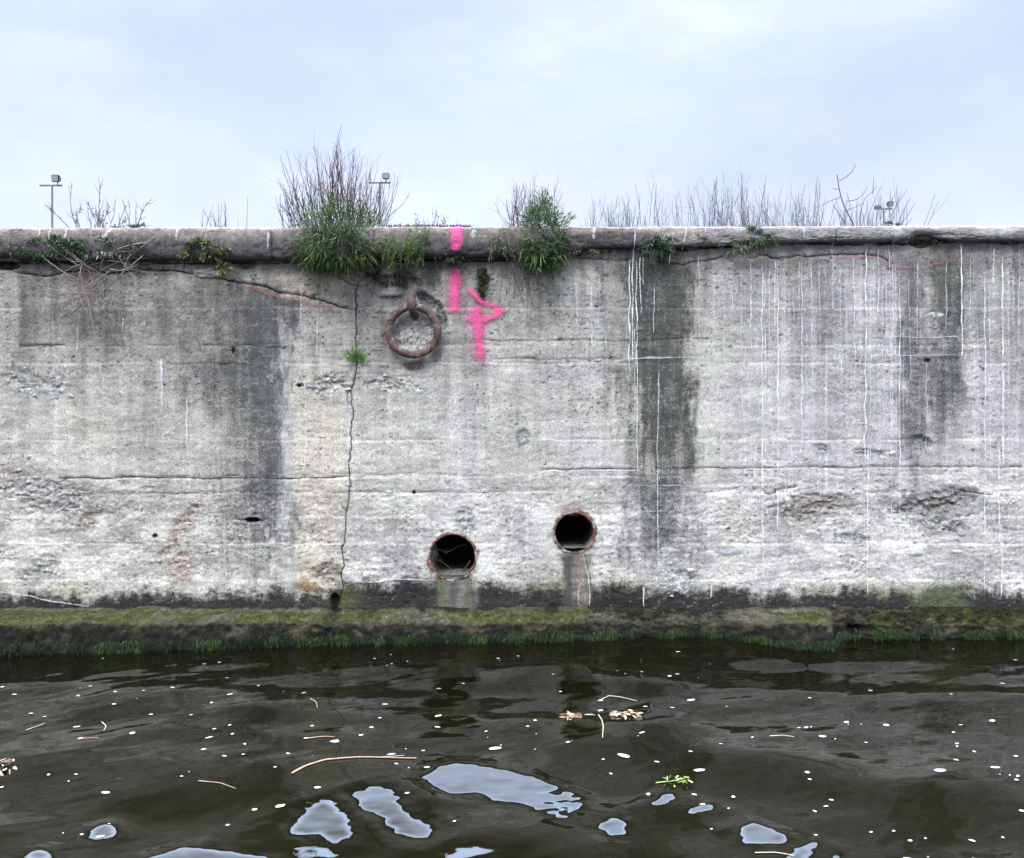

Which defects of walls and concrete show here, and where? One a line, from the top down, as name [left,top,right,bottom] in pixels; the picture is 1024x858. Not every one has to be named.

crack [9,260,496,604]
crack [394,256,548,264]
damp [0,228,1024,613]
crack [656,240,948,300]